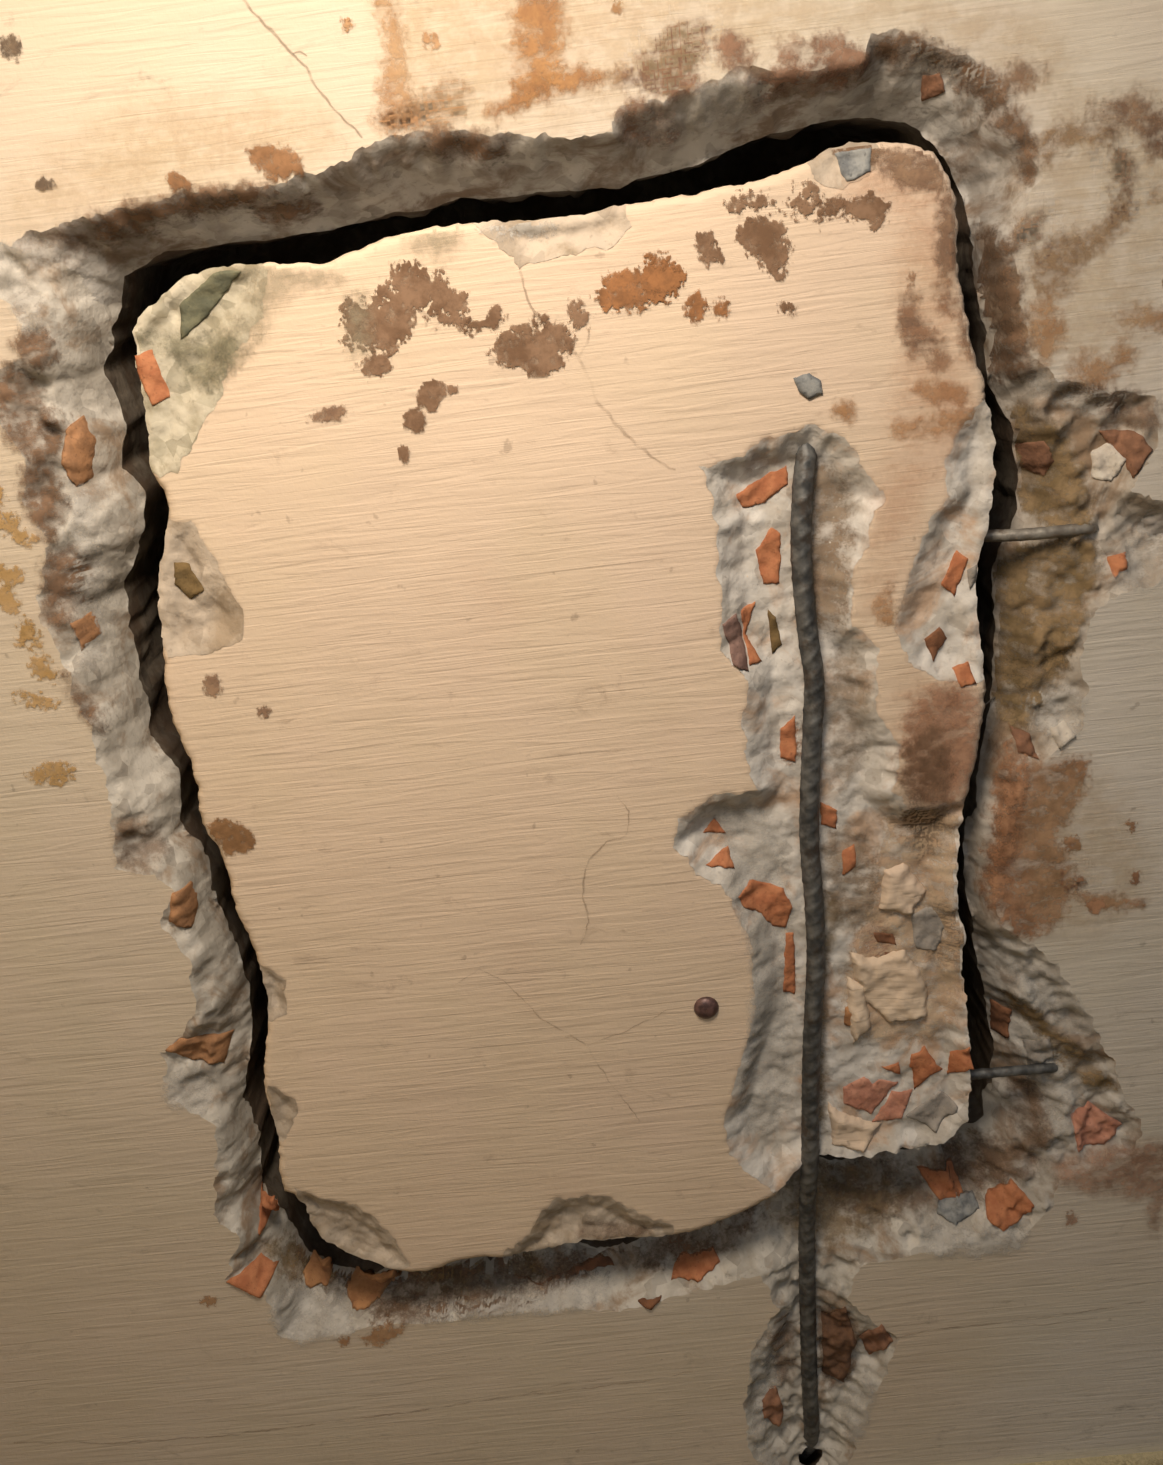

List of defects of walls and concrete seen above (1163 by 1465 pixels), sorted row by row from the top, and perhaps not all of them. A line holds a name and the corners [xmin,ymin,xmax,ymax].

water stain [0,34,22,63]
corrosion [375,0,466,135]
corrosion [487,0,602,115]
water stain [609,21,870,145]
water stain [35,176,56,191]
spalling [12,28,1043,381]
water stain [874,147,973,371]
water stain [1013,93,1163,293]
spalling [0,118,1018,1345]
spalling [673,286,1163,1465]
corrosion [980,739,1145,937]
corrosion [1059,1144,1163,1223]